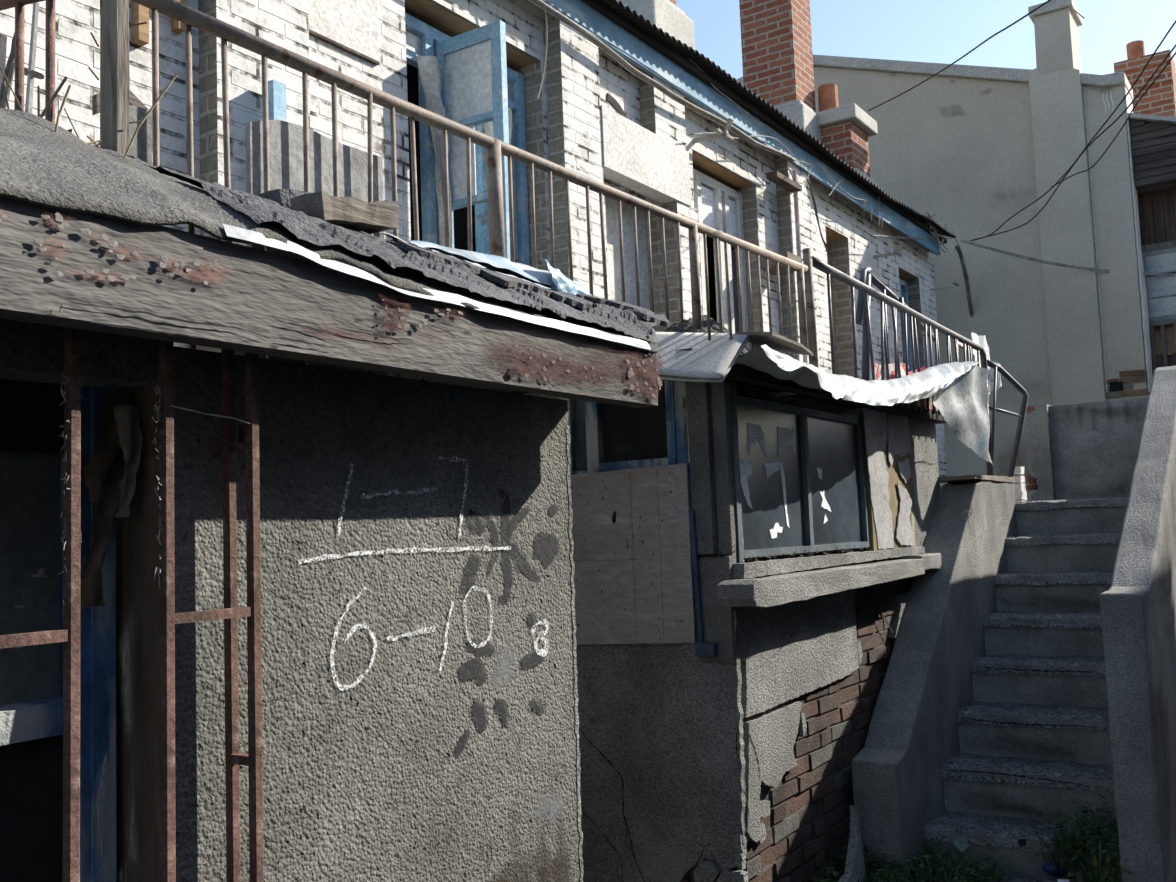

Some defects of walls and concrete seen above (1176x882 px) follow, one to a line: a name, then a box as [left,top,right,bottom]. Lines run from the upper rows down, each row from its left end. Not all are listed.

peeling [863,407,914,550]
crack [579,728,645,882]
flaking render [681,576,914,882]